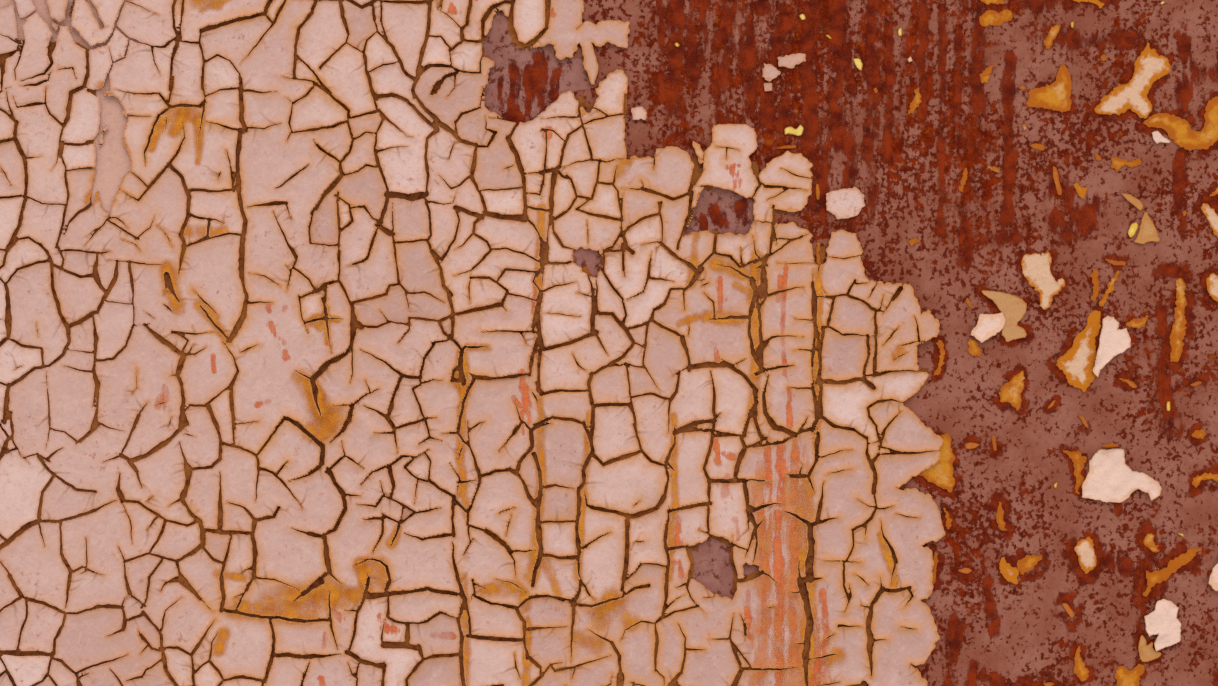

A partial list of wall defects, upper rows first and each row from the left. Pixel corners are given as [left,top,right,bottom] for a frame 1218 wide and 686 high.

crack [0,0,945,686]
corrosion [677,163,762,421]
corrosion [655,0,896,233]
peeling [816,184,865,219]
corrosion [914,0,1145,271]
peeling [1014,246,1069,318]
peeling [1046,268,1149,394]
peeling [1019,39,1218,160]
corrosion [744,386,842,686]
peeling [1059,443,1162,503]
corrosion [1093,518,1196,686]
peeling [1114,527,1218,686]